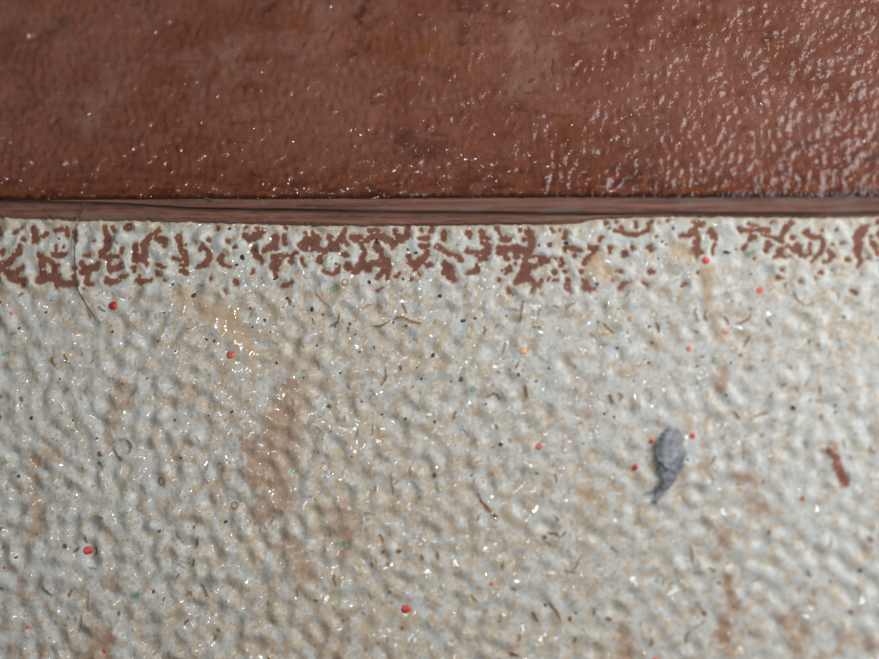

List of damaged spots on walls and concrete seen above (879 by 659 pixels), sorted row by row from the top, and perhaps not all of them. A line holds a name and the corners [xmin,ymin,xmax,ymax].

crack [73,203,103,321]
peeling [0,219,658,287]
peeling [680,220,718,259]
peeling [735,219,879,279]
corrosion [818,440,852,489]